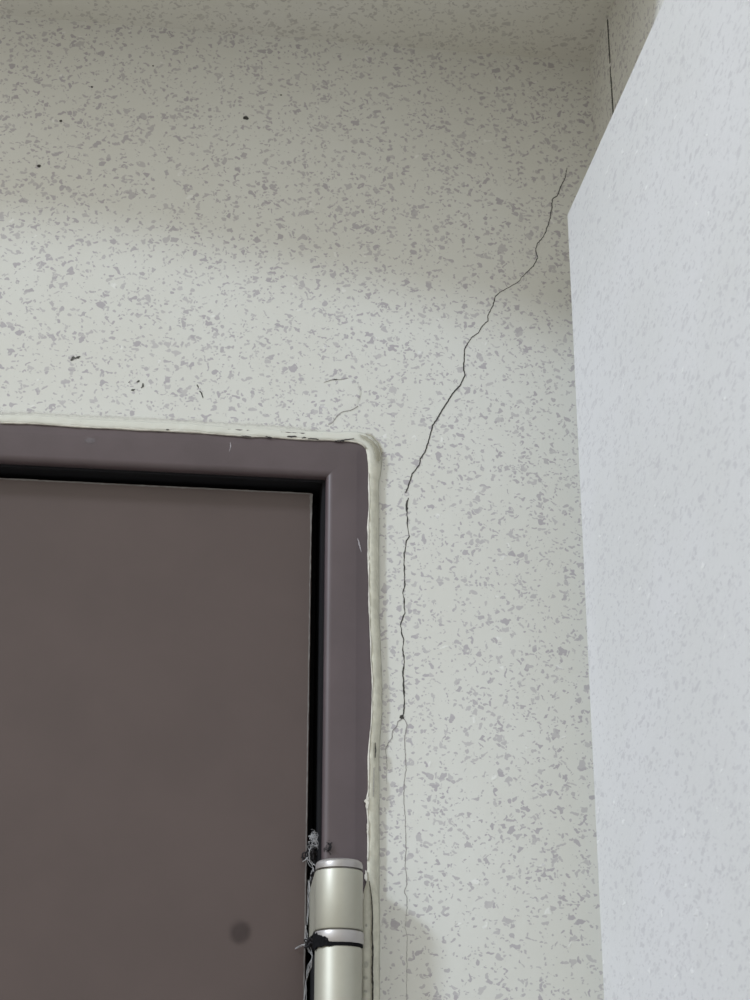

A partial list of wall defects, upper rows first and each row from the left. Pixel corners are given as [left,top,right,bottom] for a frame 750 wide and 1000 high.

crack [367,881,375,1000]
crack [373,170,567,996]